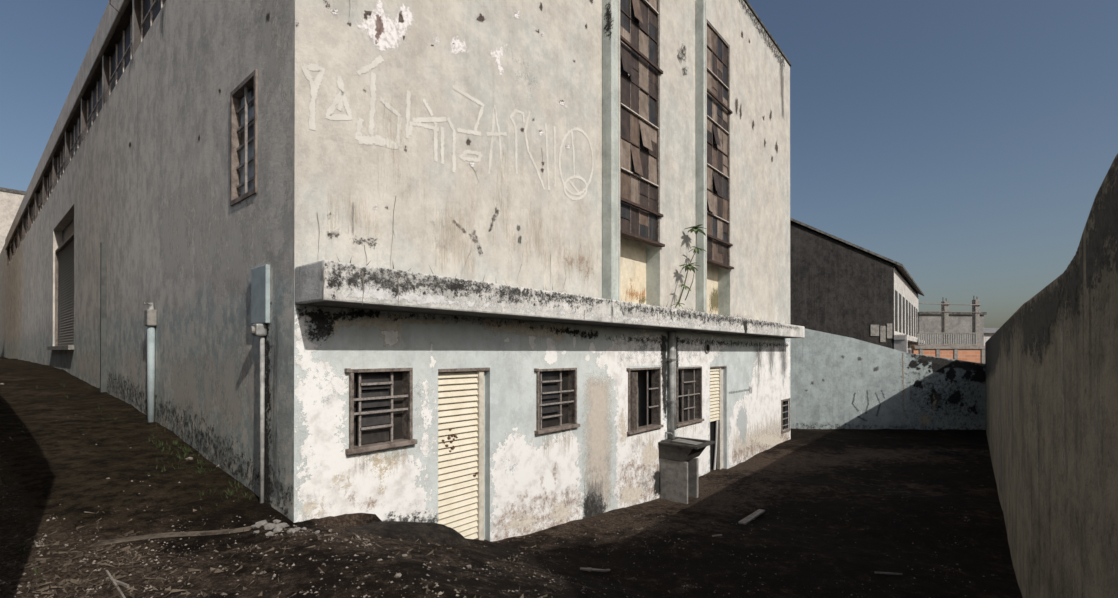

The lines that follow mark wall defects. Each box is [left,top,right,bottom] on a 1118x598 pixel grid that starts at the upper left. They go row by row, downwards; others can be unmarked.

flaking render [347,0,415,53]
leakage [107,323,293,517]
peeling [294,304,439,523]
peeling [490,427,586,542]
leakage [297,261,800,419]
peeling [330,281,791,509]
leakage [582,481,606,519]
leakage [782,157,1118,459]